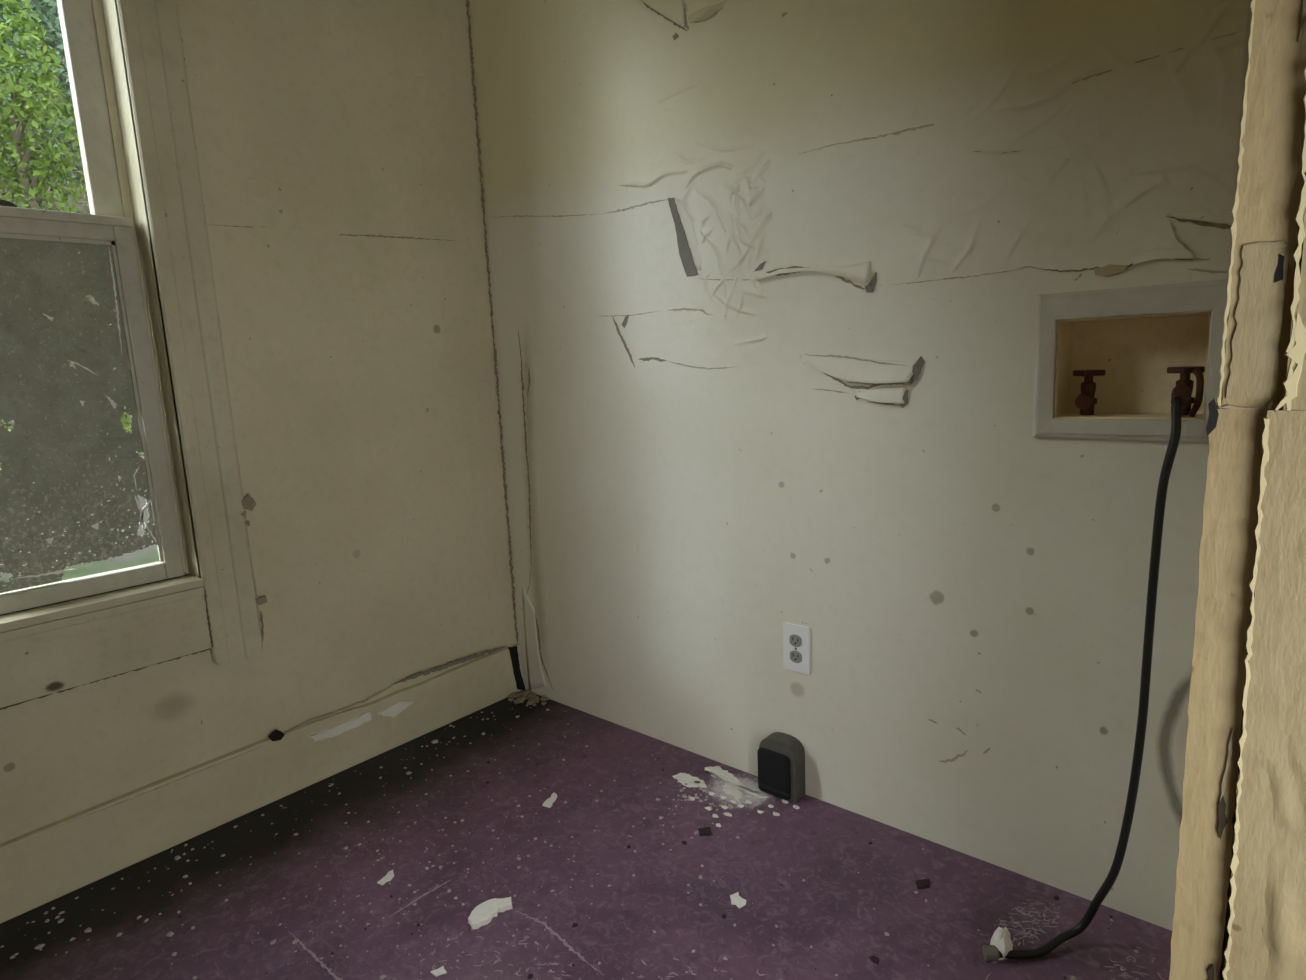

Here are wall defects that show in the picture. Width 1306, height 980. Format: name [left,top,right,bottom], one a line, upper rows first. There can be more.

peeling [641,0,728,40]
peeling [677,199,702,270]
peeling [755,261,877,292]
peeling [800,354,924,408]